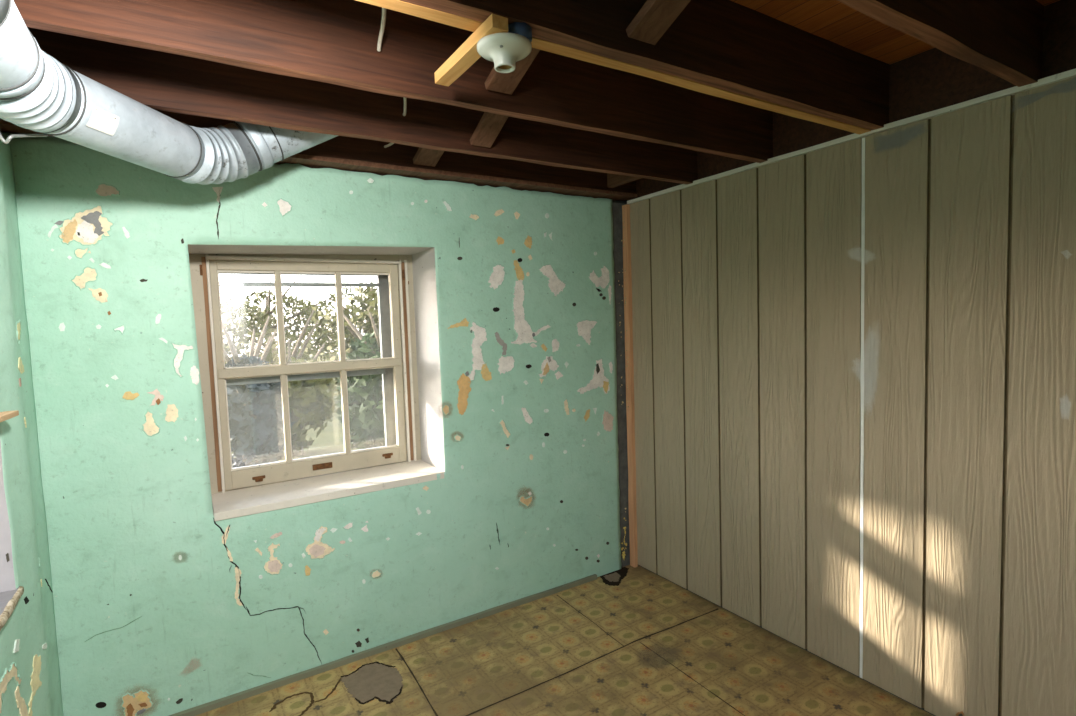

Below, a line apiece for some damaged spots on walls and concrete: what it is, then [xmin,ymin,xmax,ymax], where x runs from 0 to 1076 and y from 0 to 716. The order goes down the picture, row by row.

peeling [48,183,130,315]
peeling [588,252,612,304]
peeling [438,231,569,417]
peeling [576,319,597,347]
peeling [563,358,614,447]
crack [213,518,322,664]
peeling [254,532,292,579]
peeling [301,521,368,576]
peeling [0,639,47,716]
spalling [95,683,183,716]